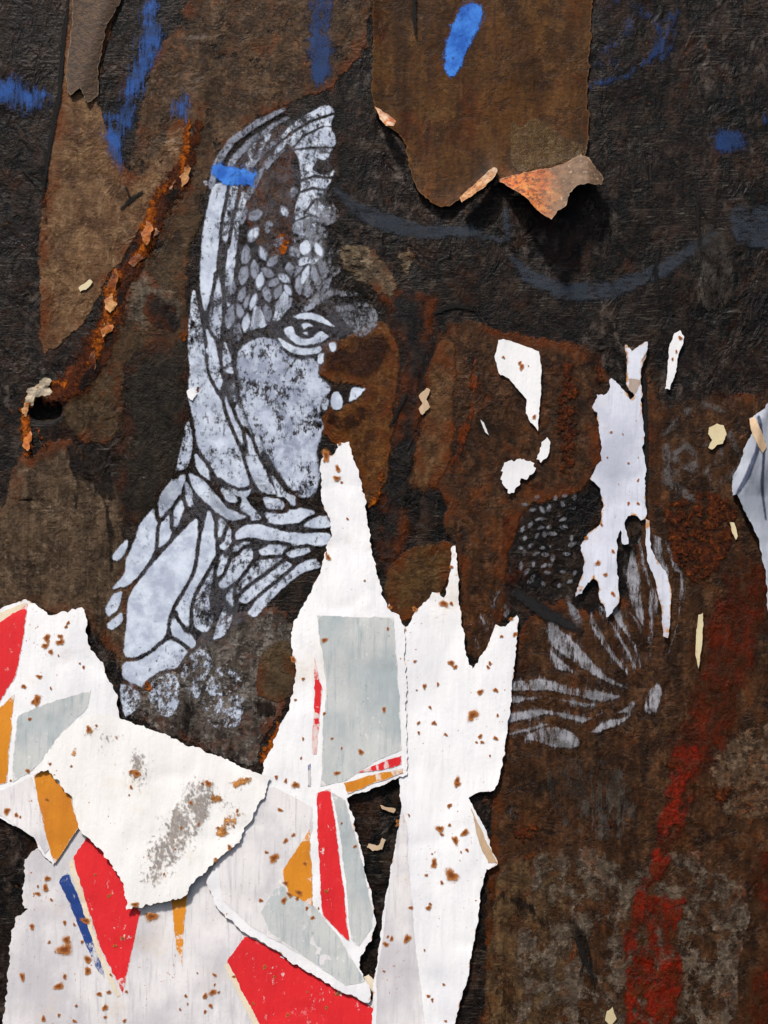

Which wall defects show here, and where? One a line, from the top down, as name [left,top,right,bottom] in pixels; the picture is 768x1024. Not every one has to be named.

peeling [375,107,396,126]
peeling [460,154,603,219]